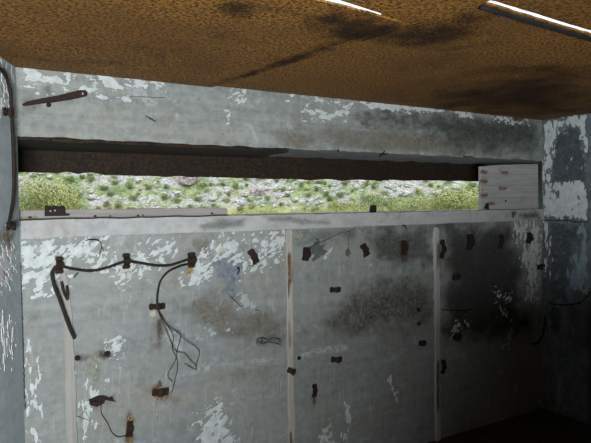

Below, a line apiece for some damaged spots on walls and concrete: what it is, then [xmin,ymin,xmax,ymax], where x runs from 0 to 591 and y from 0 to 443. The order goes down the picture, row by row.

peeling [0,57,76,130]
peeling [79,75,166,102]
peeling [301,96,444,124]
water stain [381,110,536,151]
peeling [492,114,588,321]
peeling [0,224,185,299]
water stain [444,224,530,337]
peeling [0,310,18,371]
peeling [192,397,240,443]